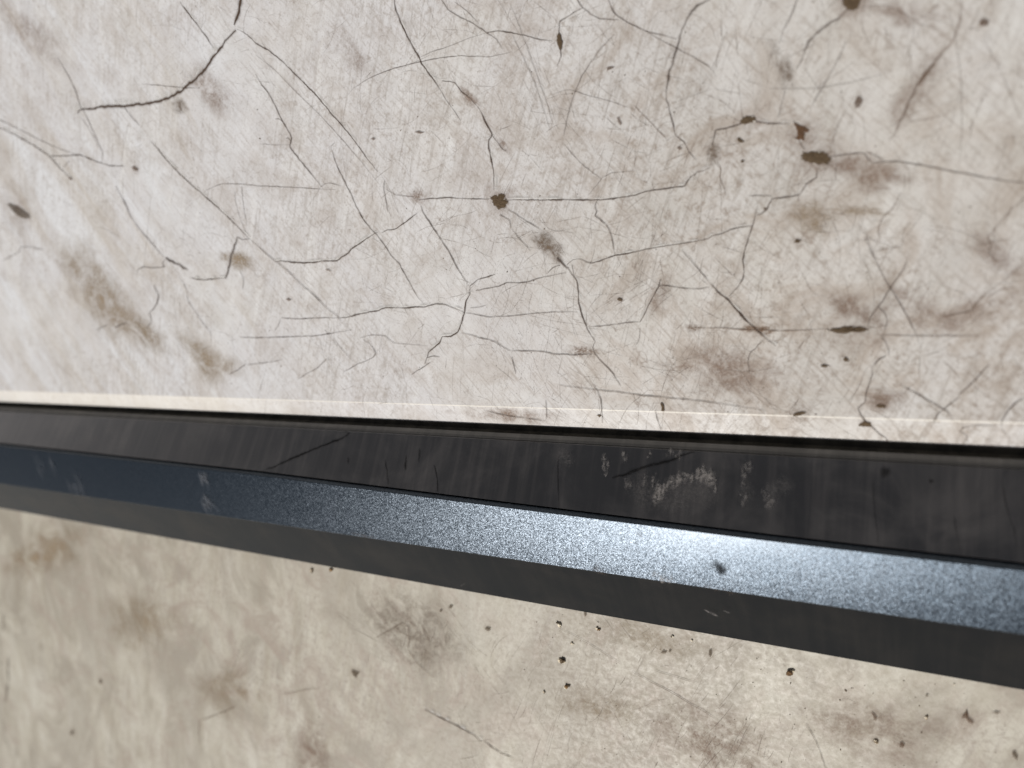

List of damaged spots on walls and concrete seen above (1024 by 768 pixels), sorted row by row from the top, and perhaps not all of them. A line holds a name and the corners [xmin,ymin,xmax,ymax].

crack [122,147,247,280]
crack [2,0,369,177]
crack [246,0,817,413]
rust [792,122,809,141]
crack [837,153,1011,182]
crack [858,268,904,442]
crack [904,367,1021,435]